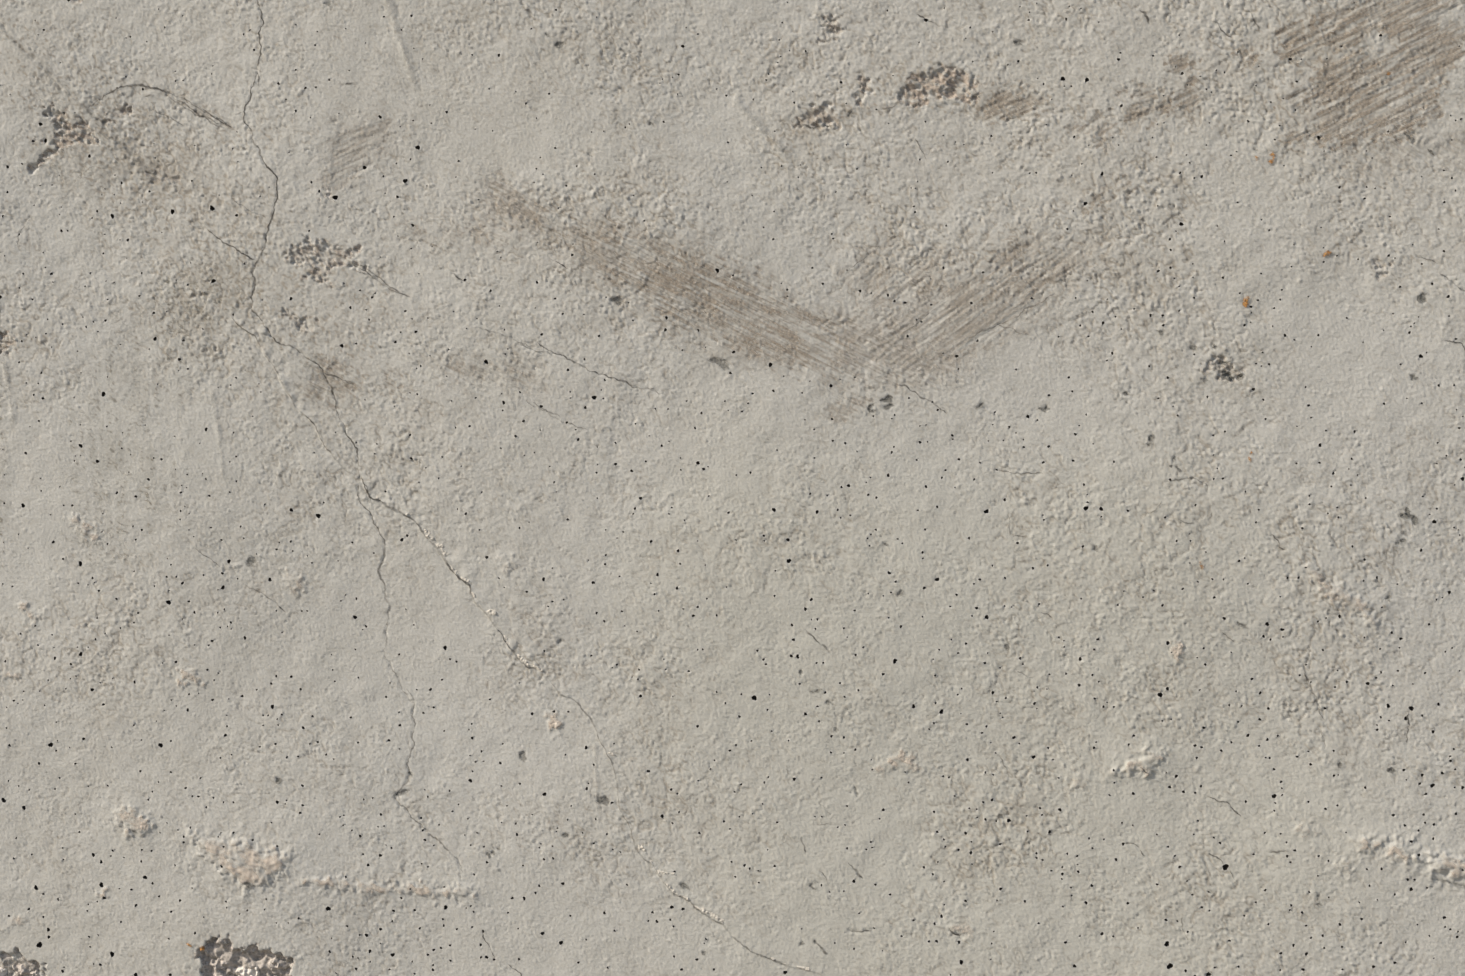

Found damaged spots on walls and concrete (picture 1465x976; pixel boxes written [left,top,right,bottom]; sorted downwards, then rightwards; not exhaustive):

crack [208,4,543,672]
crack [638,845,724,923]
spalling [0,949,46,976]
spalling [194,934,294,976]